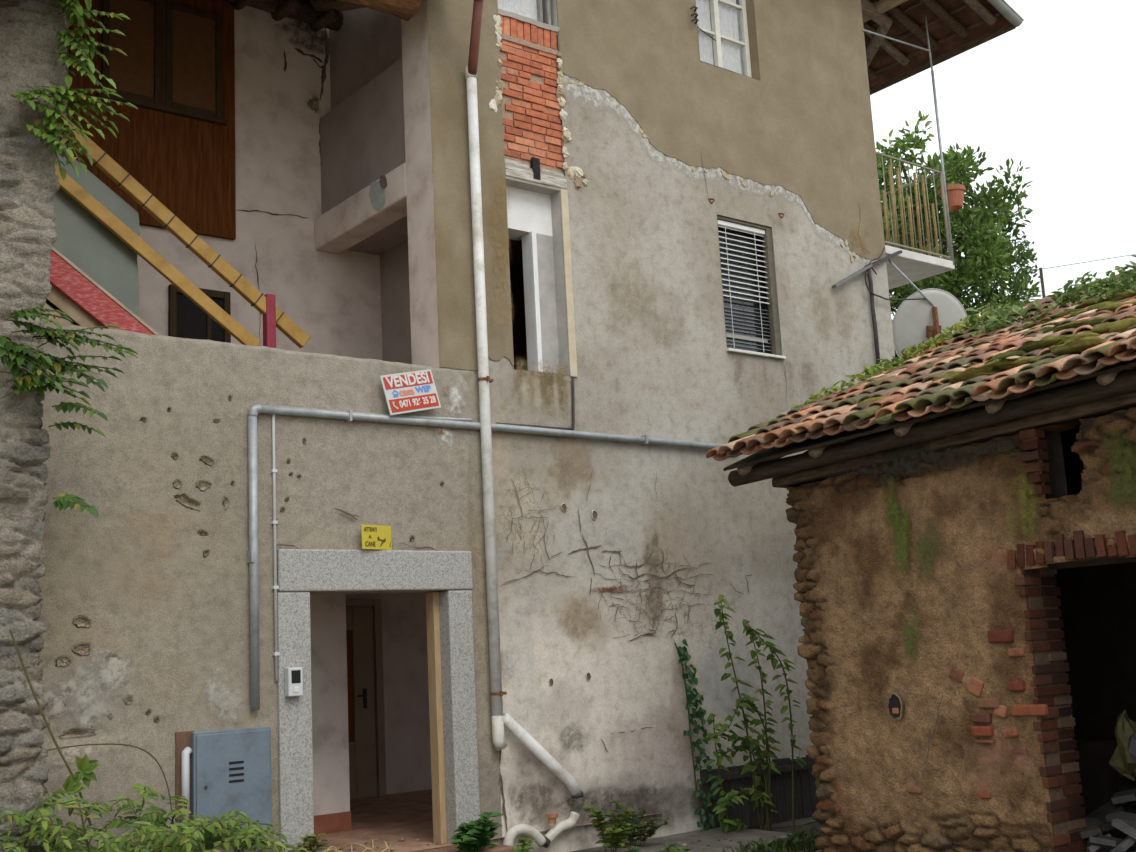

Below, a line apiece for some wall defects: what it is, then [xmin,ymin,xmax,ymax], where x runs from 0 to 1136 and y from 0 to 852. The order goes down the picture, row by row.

crack [284,28,329,164]
spalling [489,8,884,264]
crack [239,210,306,218]
spalling [173,480,212,511]
crack [499,471,751,642]
water stain [831,440,1013,580]
flaking render [42,643,134,763]
spalling [949,667,1049,754]
water stain [563,787,663,835]